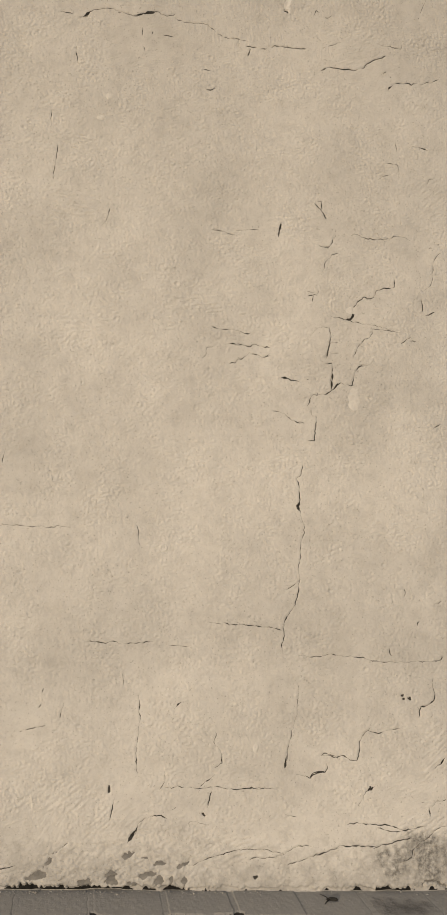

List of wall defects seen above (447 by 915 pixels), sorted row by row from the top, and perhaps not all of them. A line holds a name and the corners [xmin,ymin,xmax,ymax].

crack [61,8,439,89]
crack [321,234,439,316]
crack [206,326,269,363]
crack [276,280,416,441]
crack [210,466,395,663]
crack [284,689,400,778]
crack [127,733,271,843]
crack [193,786,445,866]